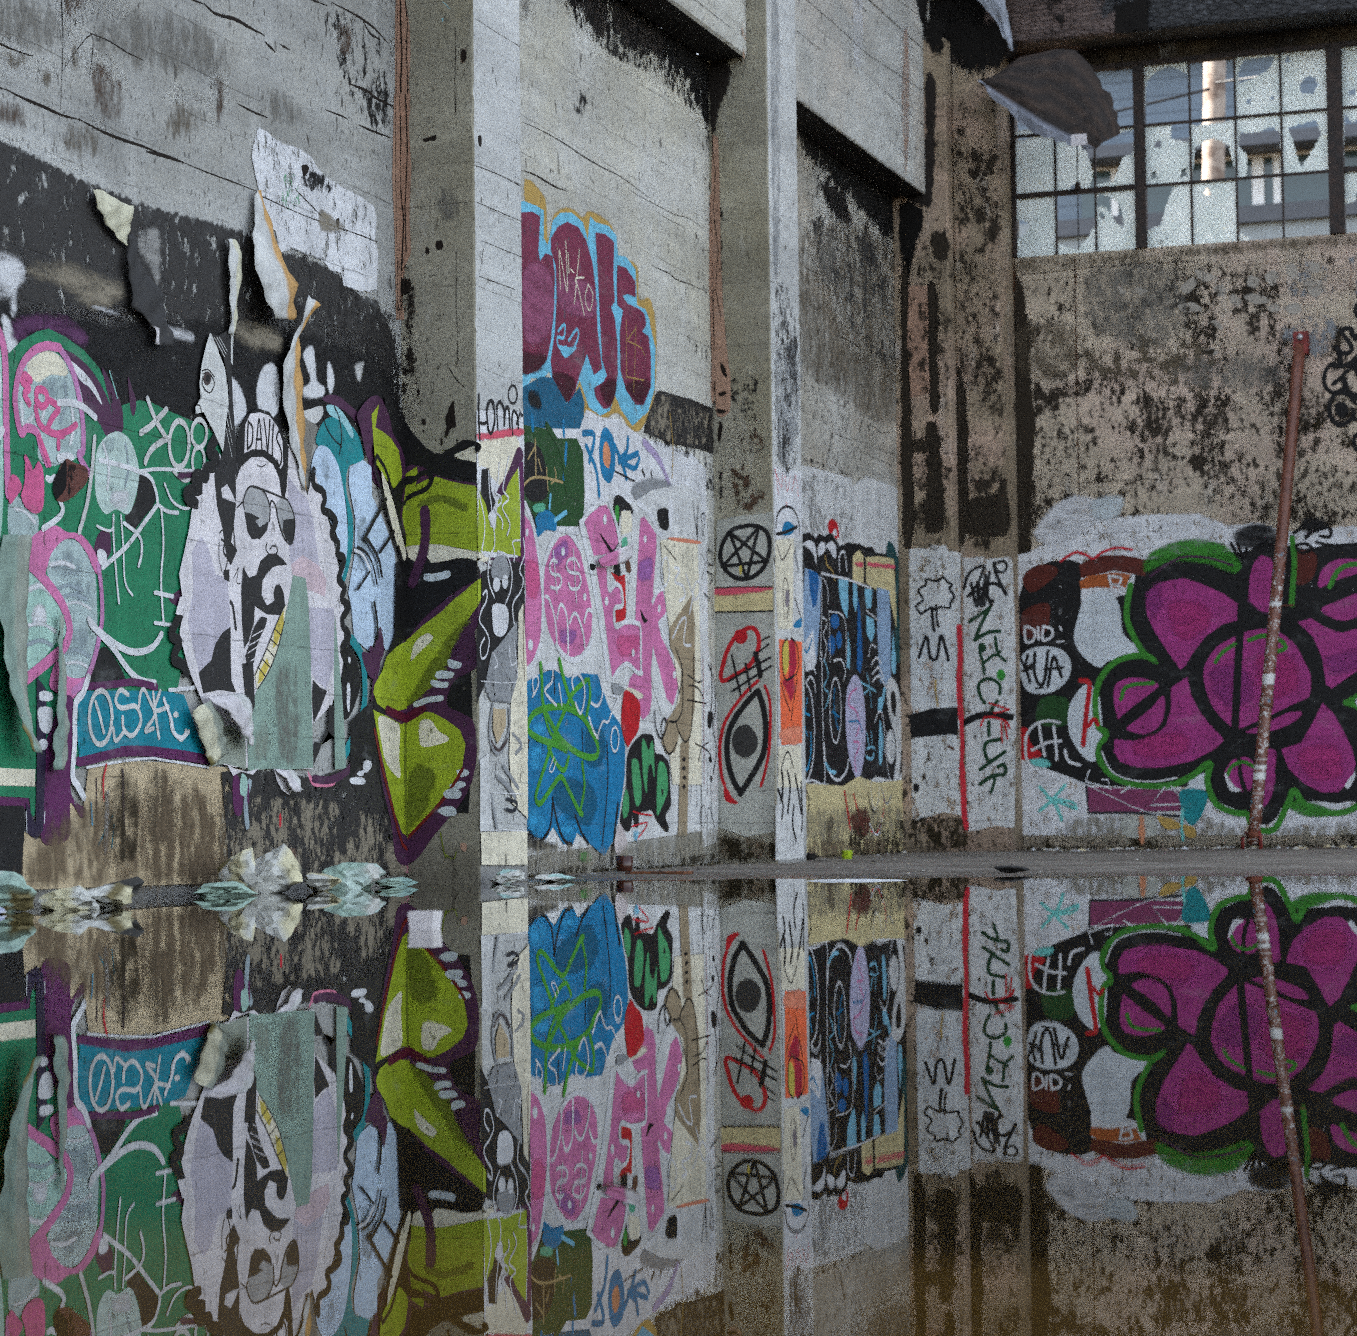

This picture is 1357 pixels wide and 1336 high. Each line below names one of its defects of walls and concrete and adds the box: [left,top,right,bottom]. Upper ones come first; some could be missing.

crack [193,0,290,52]
crack [312,0,388,43]
crack [0,4,256,191]
crack [325,83,394,138]